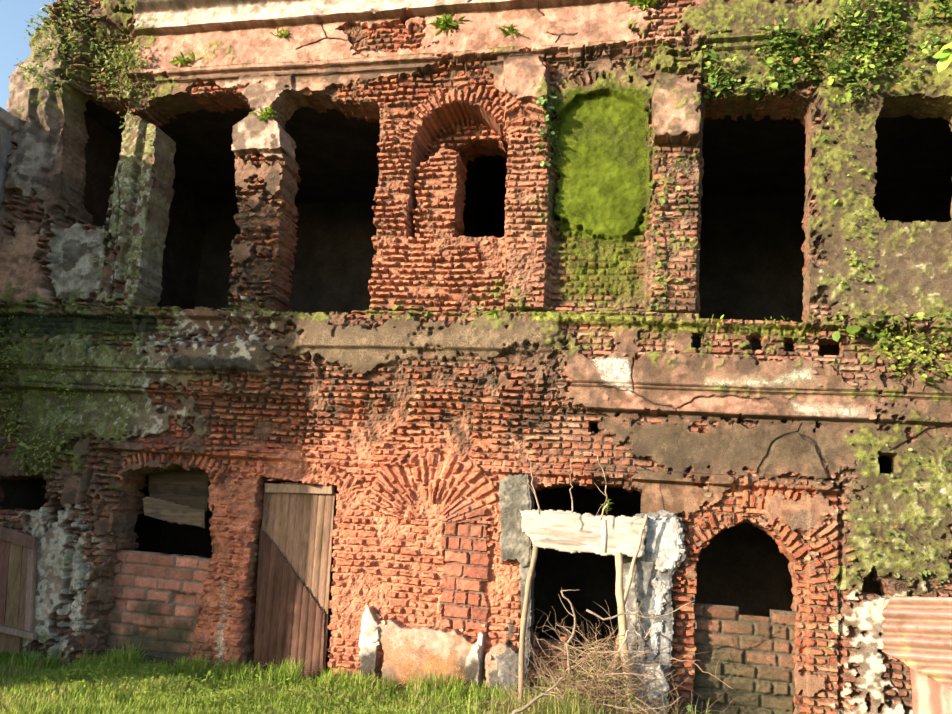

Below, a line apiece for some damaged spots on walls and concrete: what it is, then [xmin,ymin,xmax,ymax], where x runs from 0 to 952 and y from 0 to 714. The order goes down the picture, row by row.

peeling [133,0,538,57]
crack [298,26,373,49]
spalling [227,206,282,311]
water stain [0,311,158,360]
crack [599,363,766,417]
spalling [201,346,885,697]
water stain [70,552,90,636]
crack [756,426,845,714]